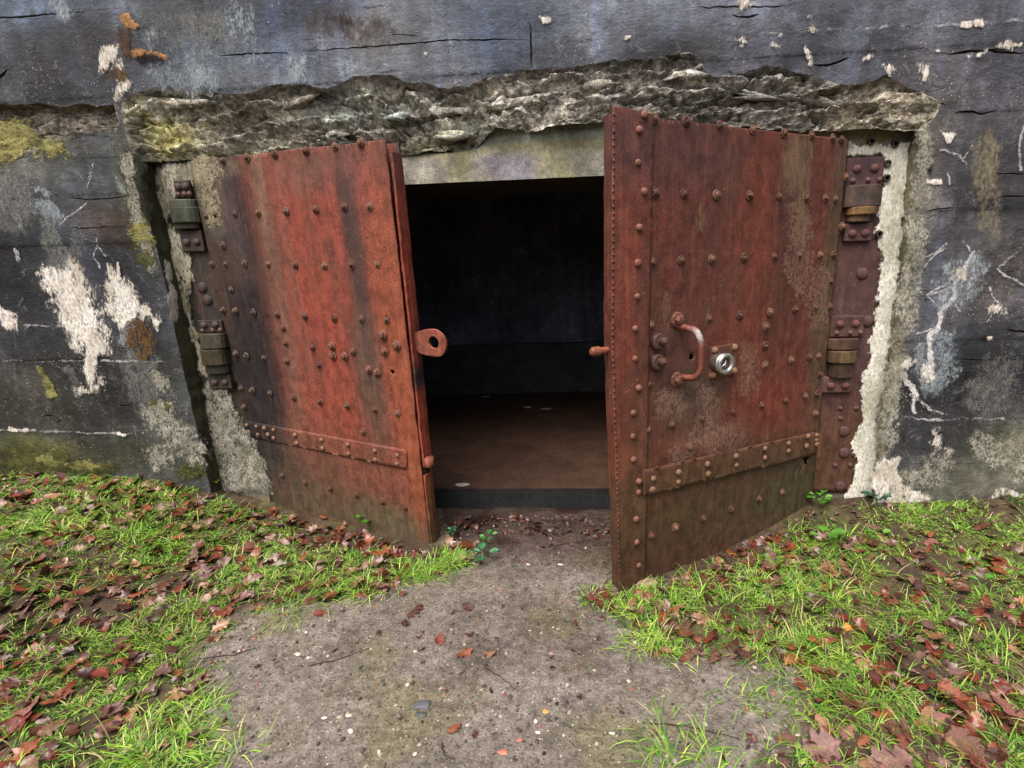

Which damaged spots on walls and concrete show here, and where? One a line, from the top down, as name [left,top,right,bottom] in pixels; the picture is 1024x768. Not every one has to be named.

corrosion [117,13,168,64]
crack [222,22,533,68]
crack [943,47,1024,55]
spalling [0,52,942,498]
leakage [939,255,989,311]
leakage [0,256,141,396]